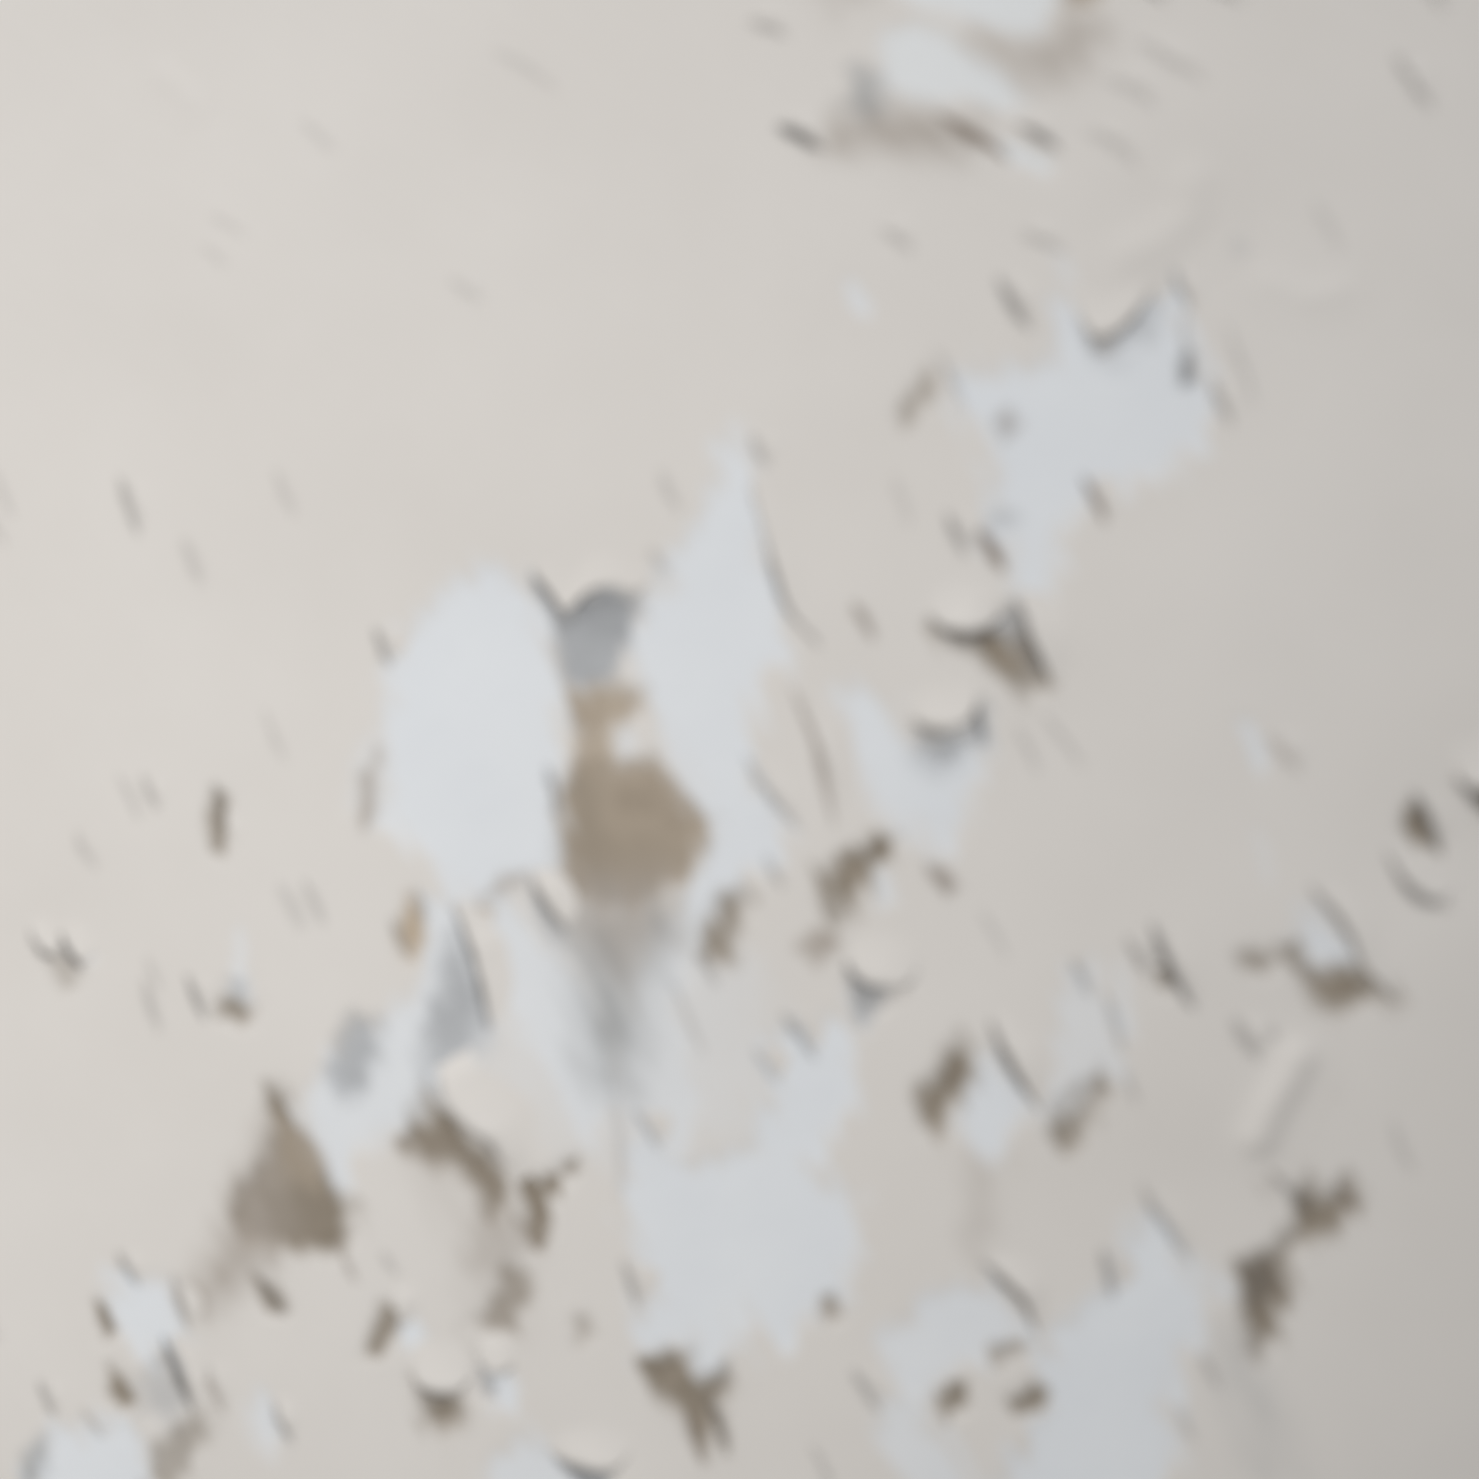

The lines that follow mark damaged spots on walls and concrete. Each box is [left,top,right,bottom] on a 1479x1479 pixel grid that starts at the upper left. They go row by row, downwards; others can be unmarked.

peeling [251,242,1378,1479]
peeling [1228,882,1414,1031]
peeling [1383,732,1479,910]
peeling [7,1248,239,1479]